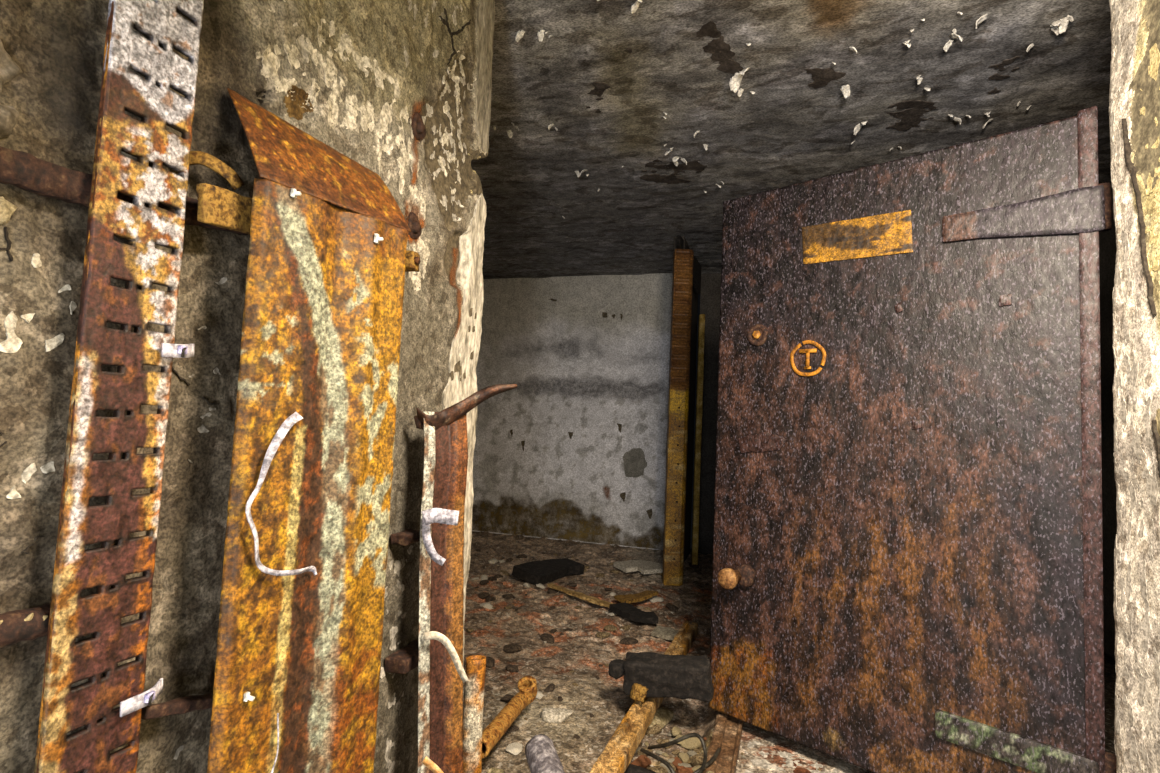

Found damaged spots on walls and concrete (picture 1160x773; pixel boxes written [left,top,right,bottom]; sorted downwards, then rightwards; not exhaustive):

crack [439,8,471,65]
peeling [586,82,610,113]
peeling [696,21,755,97]
peeling [804,62,850,99]
peeling [639,130,708,184]
peeling [1109,0,1160,773]
leakage [472,497,664,549]